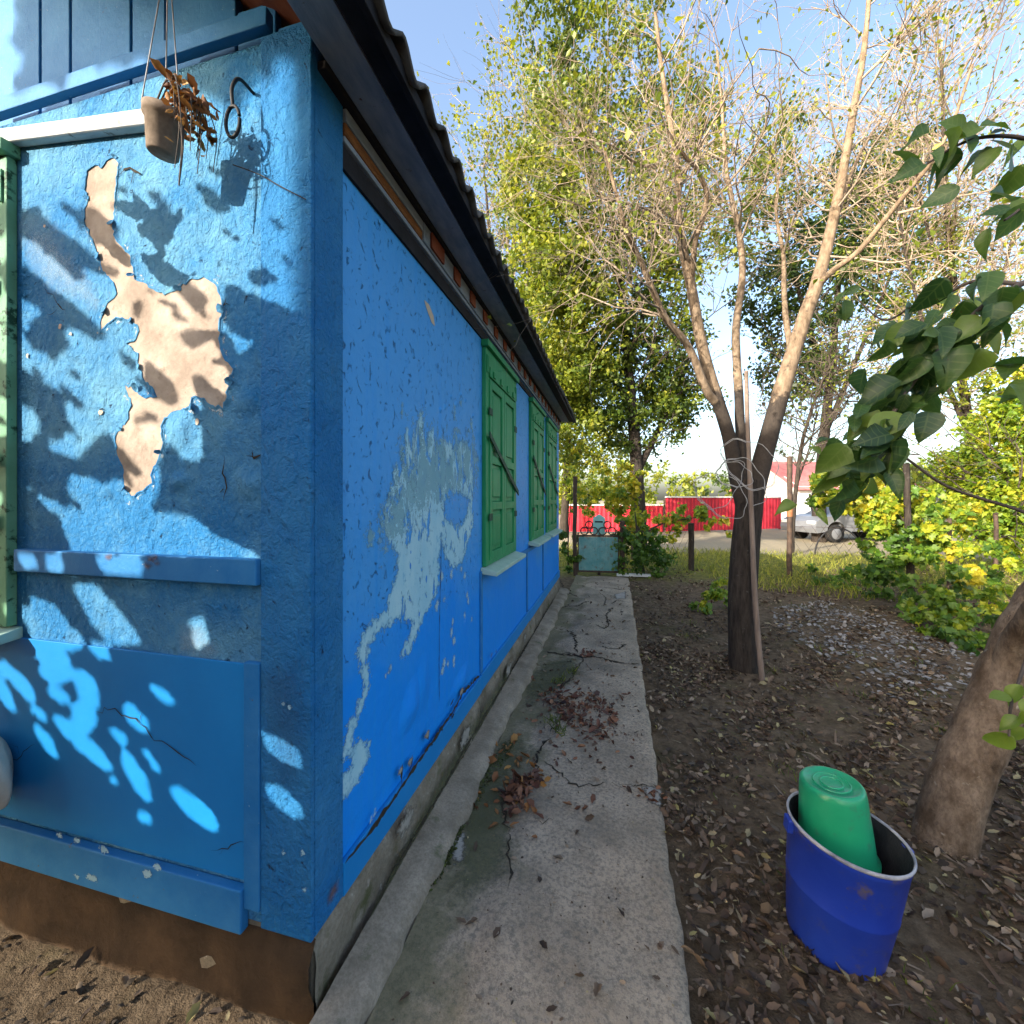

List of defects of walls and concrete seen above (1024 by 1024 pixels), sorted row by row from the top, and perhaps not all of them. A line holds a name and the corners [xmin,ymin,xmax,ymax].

peeling [82,153,238,504]
crack [95,707,195,765]
peeling [343,401,479,800]
crack [346,612,546,887]